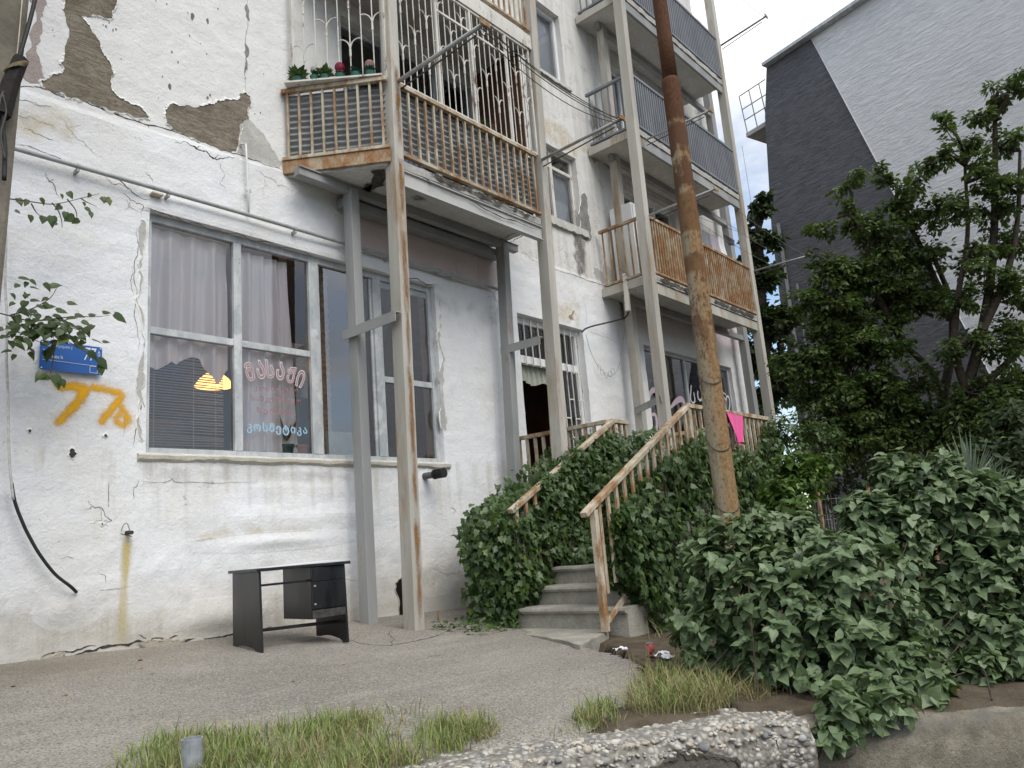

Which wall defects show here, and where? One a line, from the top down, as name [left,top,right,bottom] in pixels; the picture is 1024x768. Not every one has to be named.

flaking render [23,0,151,127]
flaking render [158,43,282,169]
crack [18,86,292,195]
spalling [362,170,386,192]
peeling [578,192,592,242]
crack [109,174,328,344]
peeling [67,446,78,461]
crack [90,478,255,525]
crack [41,633,233,658]